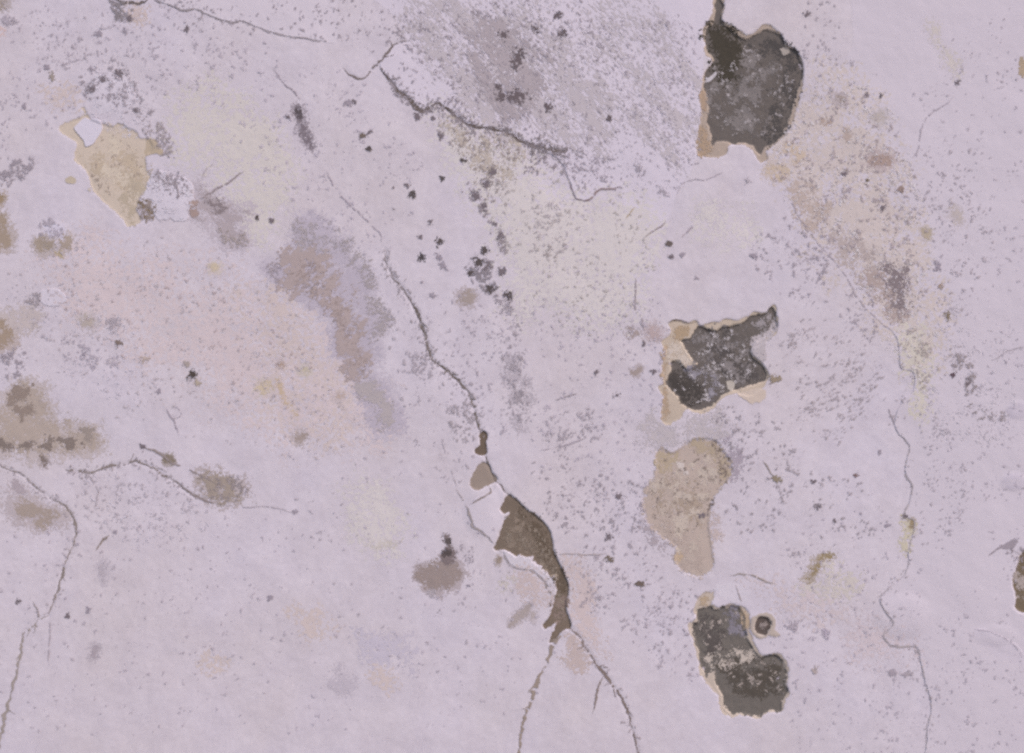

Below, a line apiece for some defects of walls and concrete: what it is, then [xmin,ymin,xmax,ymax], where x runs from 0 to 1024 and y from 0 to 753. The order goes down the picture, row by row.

peeling [59,107,194,227]
crack [344,40,620,201]
peeling [375,0,804,238]
crack [327,172,552,595]
damp [0,0,993,614]
crack [634,278,644,329]
spalling [658,305,779,425]
crack [0,448,289,740]
crack [517,628,639,753]
spalling [641,437,790,719]
crack [879,408,932,748]